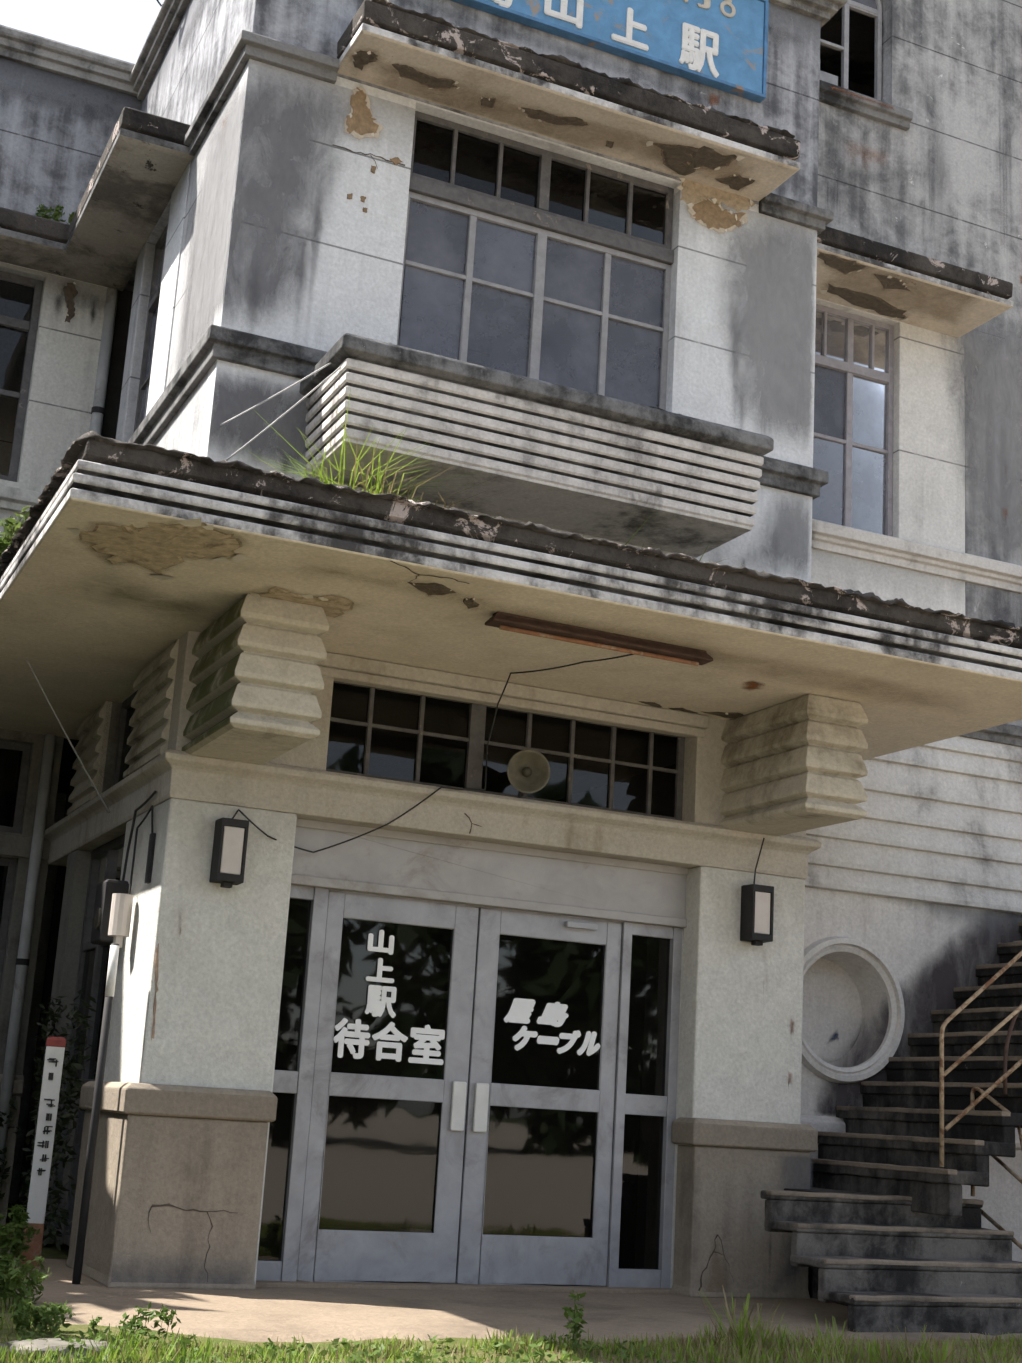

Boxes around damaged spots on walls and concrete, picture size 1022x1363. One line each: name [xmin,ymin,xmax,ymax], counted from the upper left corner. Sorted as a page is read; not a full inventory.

peeling [352,50,460,89]
spalling [344,87,384,140]
peeling [517,106,588,126]
peeling [645,141,755,234]
leakage [176,86,331,373]
peeling [817,249,910,321]
peeling [67,518,252,580]
leakage [820,912,1022,1115]
crack [148,1204,234,1282]